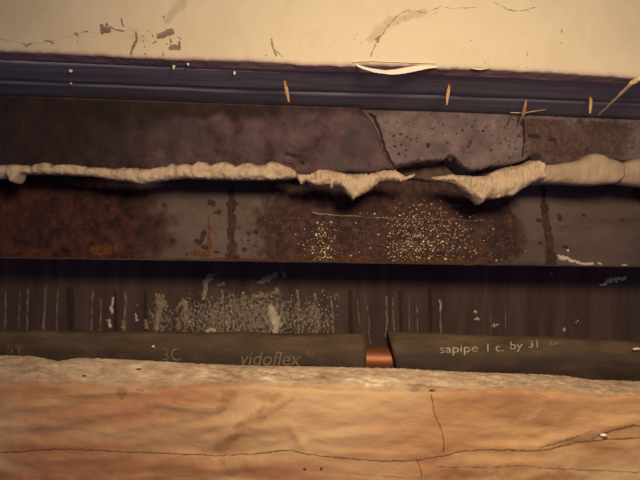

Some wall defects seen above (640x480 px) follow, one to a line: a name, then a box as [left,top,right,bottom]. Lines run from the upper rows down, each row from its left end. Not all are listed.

peeling [100,18,124,34]
peeling [152,29,181,57]
crack [369,113,430,169]
crack [506,118,557,157]
rust [0,176,175,259]
rust [172,179,525,264]
rust [536,185,556,265]
water stain [135,271,339,333]
crack [0,394,640,476]